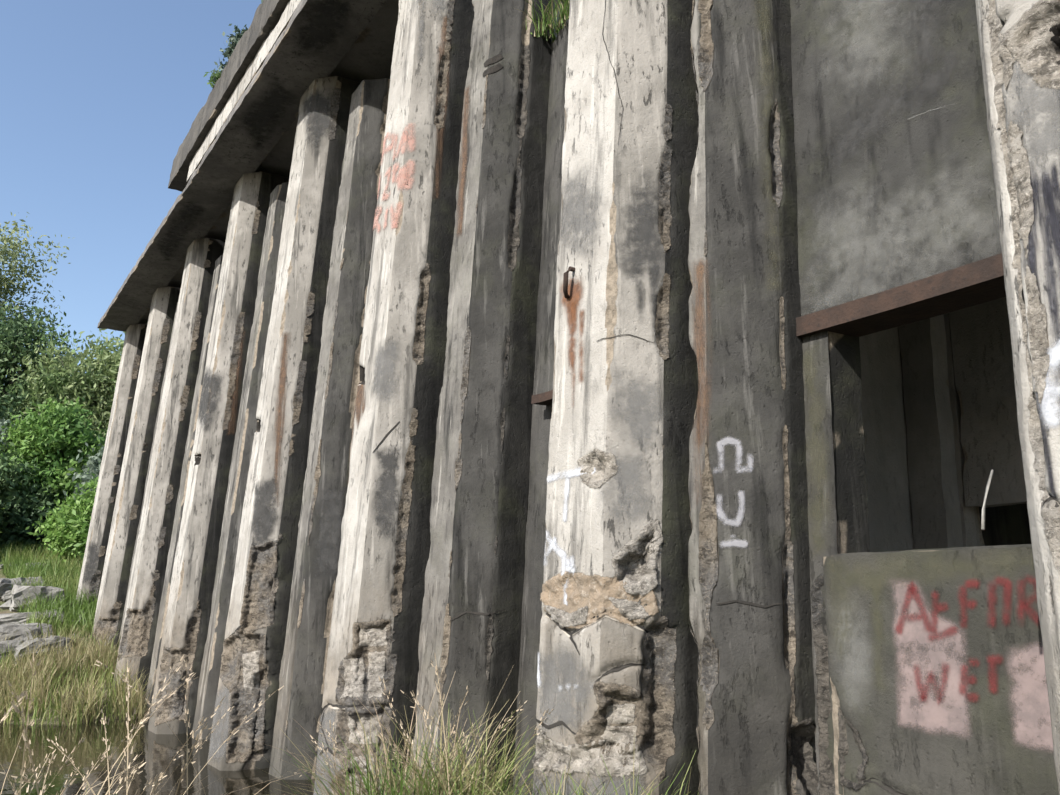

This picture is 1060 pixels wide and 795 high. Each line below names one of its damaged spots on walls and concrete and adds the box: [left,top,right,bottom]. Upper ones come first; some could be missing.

crack [602,0,623,140]
spalling [222,312,245,430]
spalling [412,263,431,365]
rust [562,280,584,381]
water stain [562,179,596,249]
water stain [624,186,665,325]
spalling [986,0,1060,613]
spalling [577,449,618,489]
spalling [154,600,201,726]
spalling [220,533,283,763]
spalling [332,408,418,795]
spalling [532,519,677,783]